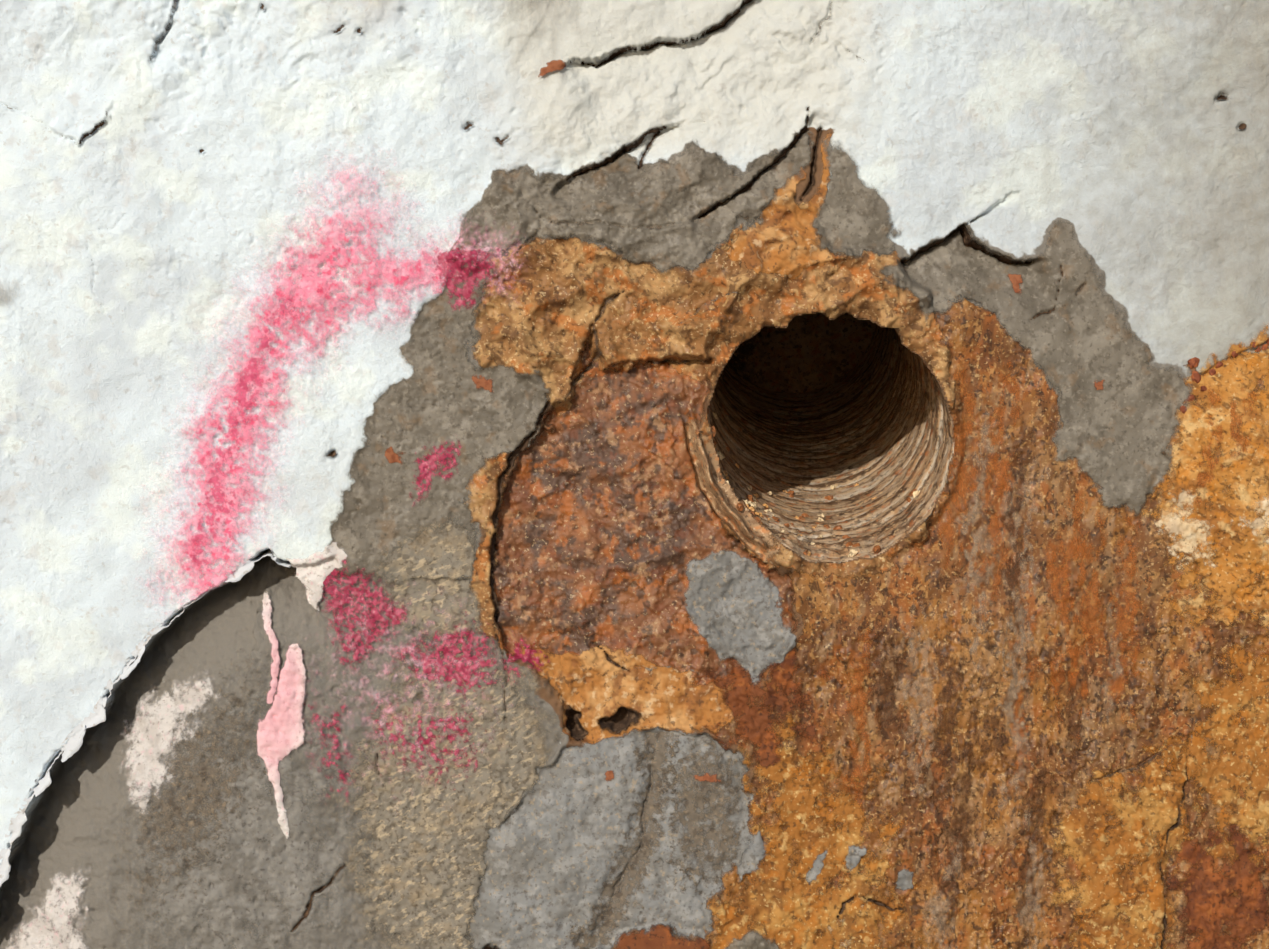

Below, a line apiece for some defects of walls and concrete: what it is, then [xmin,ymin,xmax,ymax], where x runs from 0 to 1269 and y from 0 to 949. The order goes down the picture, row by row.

crack [150,0,177,61]
crack [570,0,753,68]
rust [726,133,833,280]
rust [1008,274,1023,293]
rust [472,375,493,392]
spalling [330,217,961,949]
rust [614,298,1269,949]
peeling [0,542,347,890]
peeling [6,874,88,949]